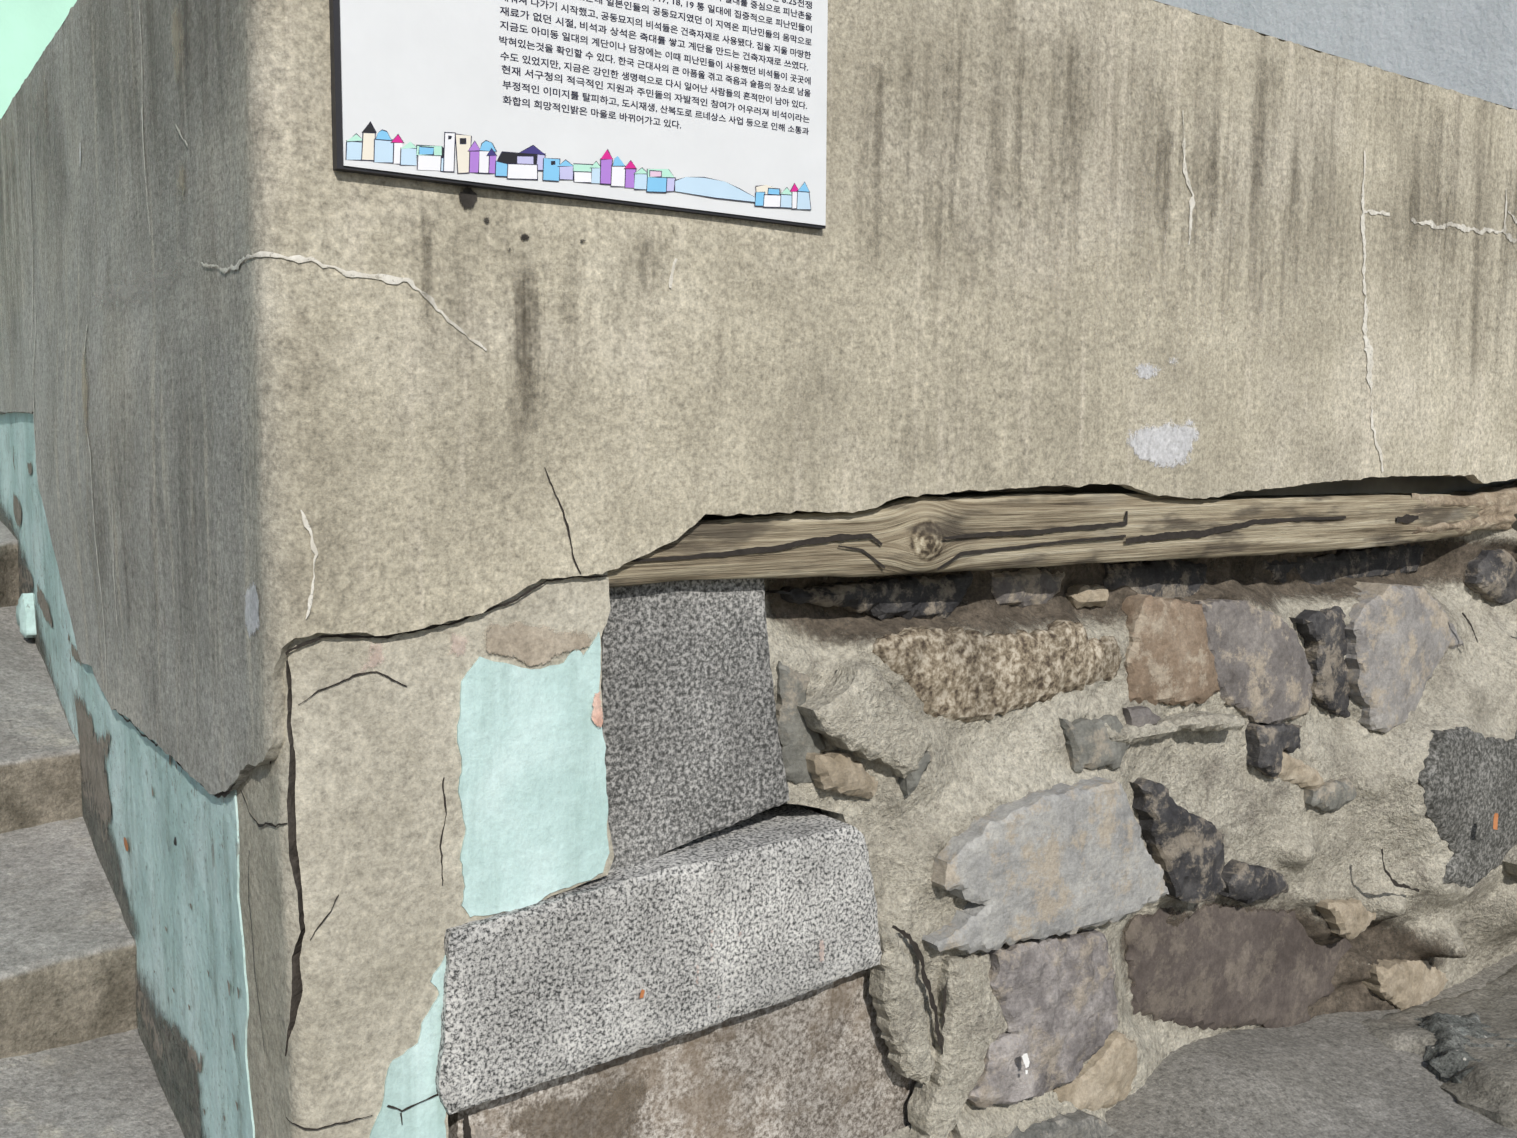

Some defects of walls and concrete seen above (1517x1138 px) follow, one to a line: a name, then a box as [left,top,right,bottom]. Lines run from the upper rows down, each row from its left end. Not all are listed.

crack [201,251,487,351]
crack [1361,151,1517,472]
peeling [9,493,22,537]
peeling [18,564,82,664]
peeling [74,690,112,852]
crack [85,423,607,1056]